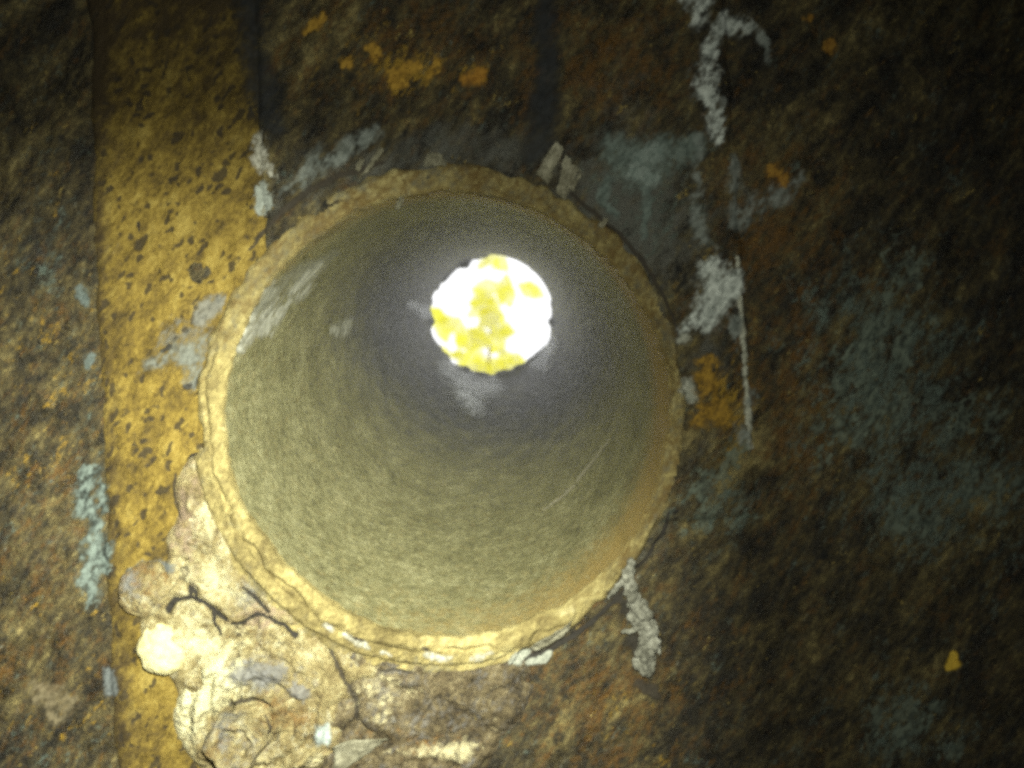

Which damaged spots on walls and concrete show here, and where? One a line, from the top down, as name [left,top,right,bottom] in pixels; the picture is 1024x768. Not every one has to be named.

corrosion [302,12,327,36]
corrosion [364,43,381,63]
corrosion [387,57,441,90]
corrosion [460,67,487,85]
water stain [596,0,769,243]
water stain [299,126,378,180]
corrosion [766,163,789,187]
water stain [676,256,753,450]
corrosion [691,354,735,428]
water stain [73,464,113,609]
crack [166,585,299,639]